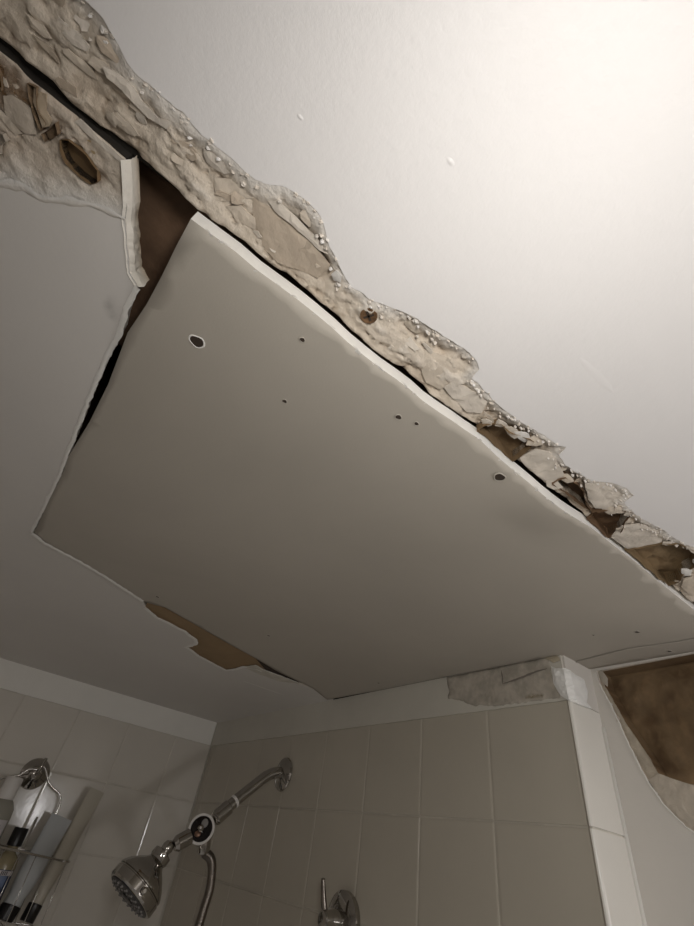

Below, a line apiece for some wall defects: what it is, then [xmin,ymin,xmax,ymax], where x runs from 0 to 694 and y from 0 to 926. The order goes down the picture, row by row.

flaking render [0,0,694,602]
flaking render [447,655,592,709]
spalling [598,651,694,833]